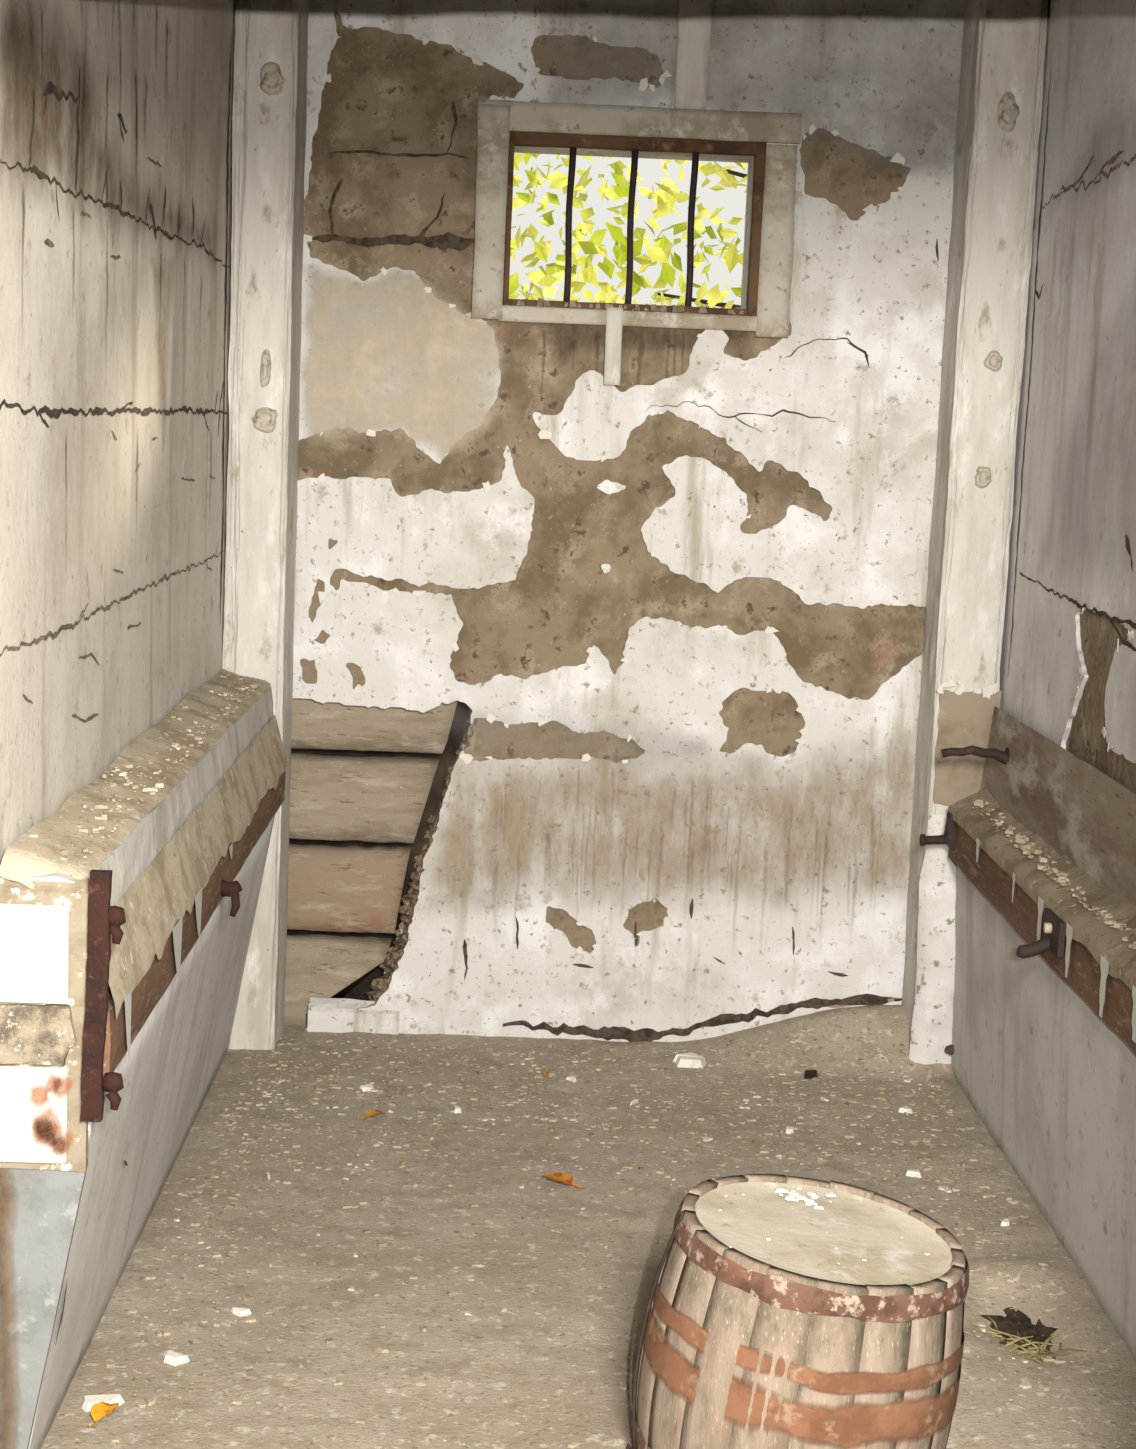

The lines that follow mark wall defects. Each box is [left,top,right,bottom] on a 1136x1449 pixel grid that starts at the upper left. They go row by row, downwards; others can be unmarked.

crack [0,55,231,656]
flaking render [297,11,926,700]
crack [1008,73,1136,672]
flaking render [719,687,808,757]
flaking render [1066,608,1136,793]
flaking render [287,701,645,1003]
flaking render [623,898,674,946]
water stain [446,771,902,889]
crack [503,994,902,1042]
rust [32,1076,70,1154]